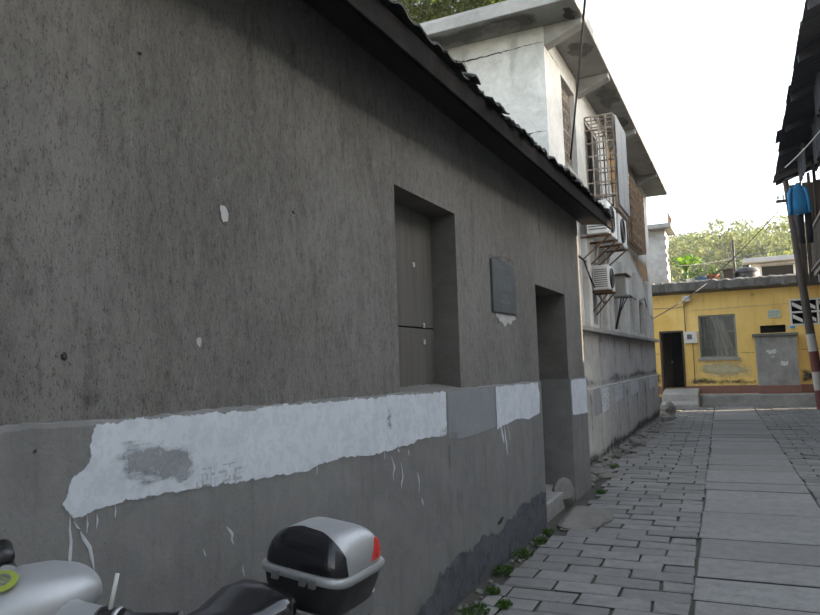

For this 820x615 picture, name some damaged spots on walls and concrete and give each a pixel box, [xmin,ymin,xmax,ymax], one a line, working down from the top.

crack [462,41,558,67]
leakage [418,491,547,615]